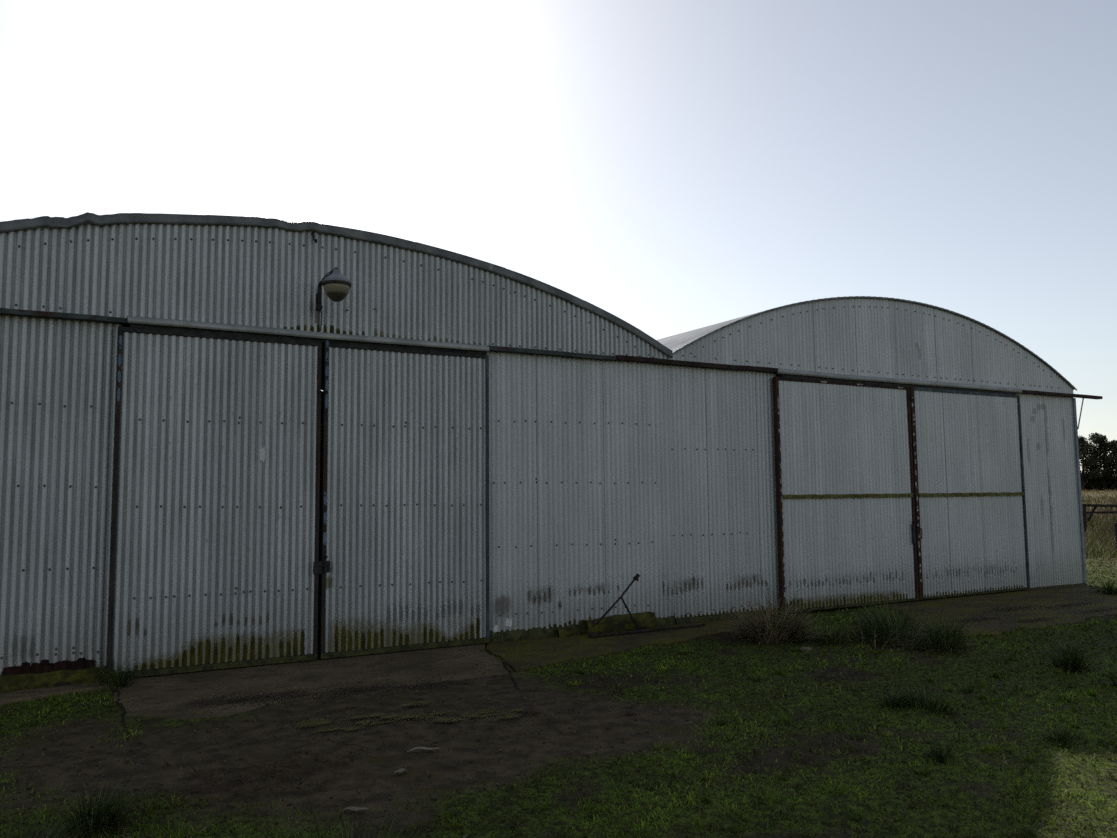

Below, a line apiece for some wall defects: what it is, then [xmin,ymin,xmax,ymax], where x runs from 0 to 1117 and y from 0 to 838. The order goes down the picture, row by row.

leakage [528,586,619,608]
leakage [215,614,268,626]
corrosion [1,658,96,675]